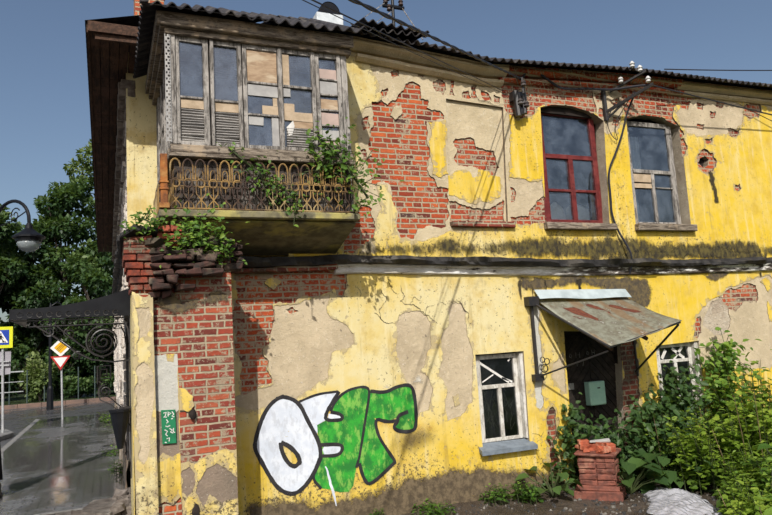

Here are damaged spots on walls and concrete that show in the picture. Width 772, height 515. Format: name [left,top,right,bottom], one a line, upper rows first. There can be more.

flaking render [344,63,772,253]
leakage [708,171,719,203]
flaking render [131,259,354,515]
peeling [396,311,433,414]
crack [375,283,469,324]
peeling [439,303,473,421]
leakage [518,276,651,307]
rust [564,304,644,321]
peeling [693,275,772,370]
leakage [246,466,565,515]